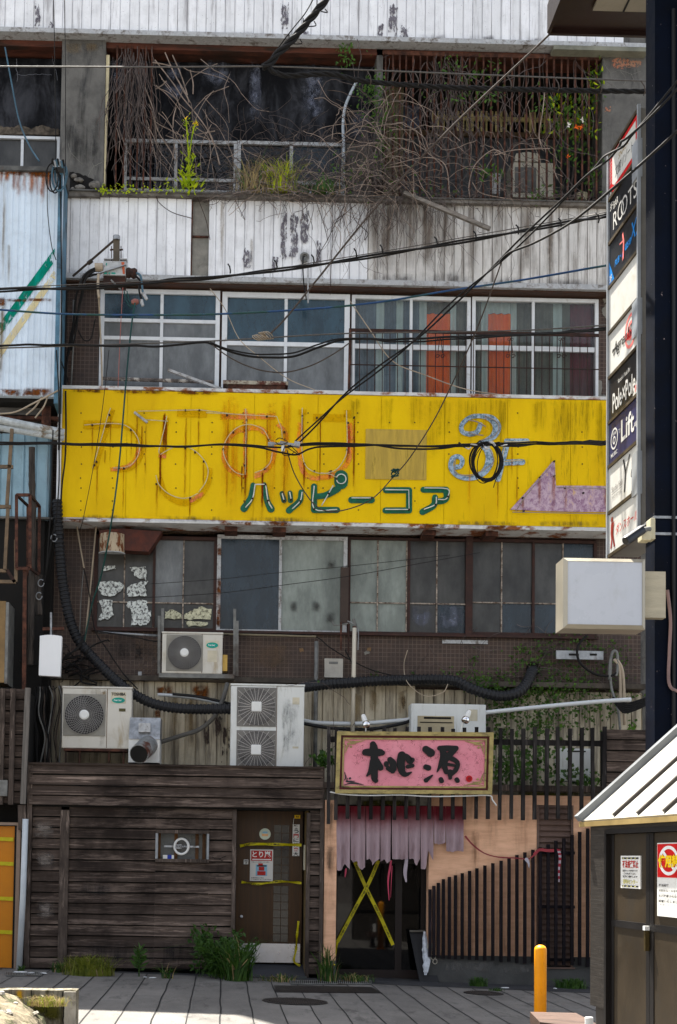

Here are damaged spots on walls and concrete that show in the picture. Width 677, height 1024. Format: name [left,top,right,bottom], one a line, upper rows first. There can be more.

corrosion [0,172,54,194]
water stain [372,205,449,258]
corrosion [156,414,167,496]
corrosion [227,423,247,494]